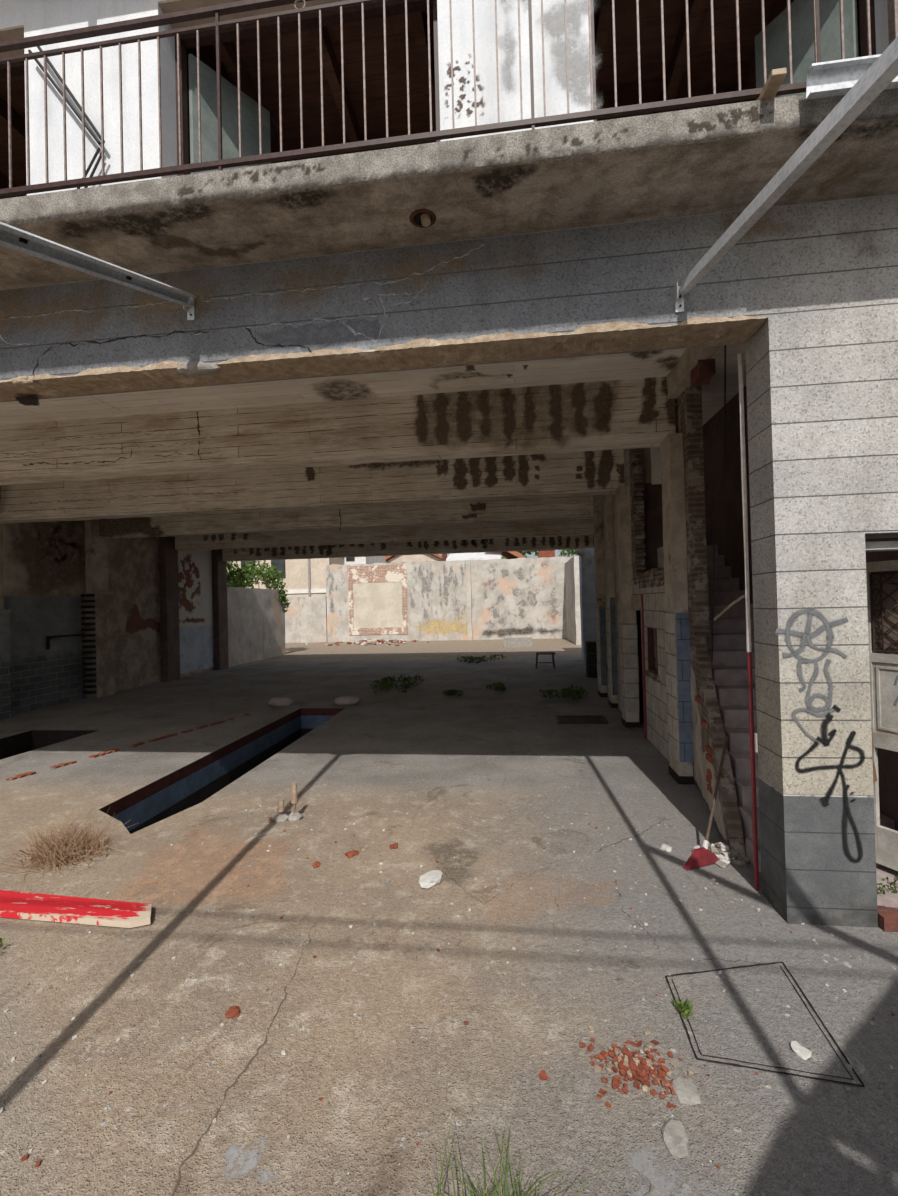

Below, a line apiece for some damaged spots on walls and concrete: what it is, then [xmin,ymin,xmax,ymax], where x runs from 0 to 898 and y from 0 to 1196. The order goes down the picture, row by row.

peeling [445,61,484,115]
damp [563,104,817,158]
damp [835,114,898,142]
damp [3,144,548,257]
crack [0,243,485,381]
damp [319,382,370,401]
damp [631,350,678,426]
crack [0,396,211,466]
damp [350,365,624,490]
peeling [178,555,204,623]
crack [171,924,315,1196]